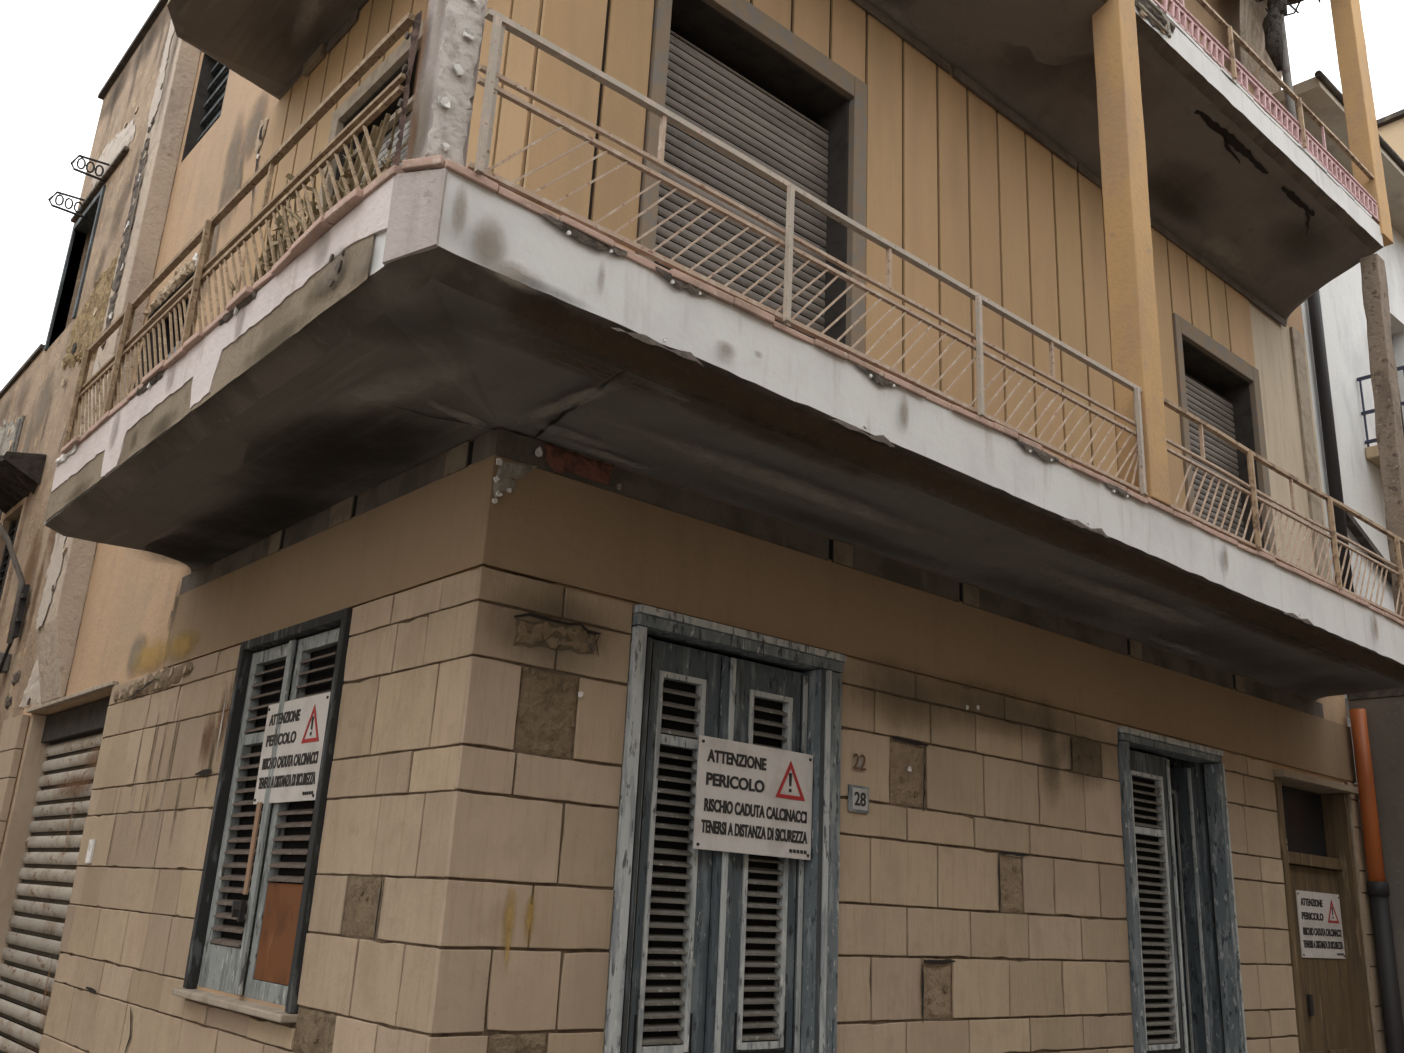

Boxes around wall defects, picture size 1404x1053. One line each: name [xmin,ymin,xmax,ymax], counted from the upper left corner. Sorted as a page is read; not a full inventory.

flaking render [424,0,485,166]
flaking render [55,19,175,466]
damp [203,102,263,288]
spalling [219,290,256,326]
peeling [328,250,345,287]
crack [1194,110,1315,234]
flaking render [492,443,621,504]
peeling [36,533,67,630]
flaking render [4,657,41,709]